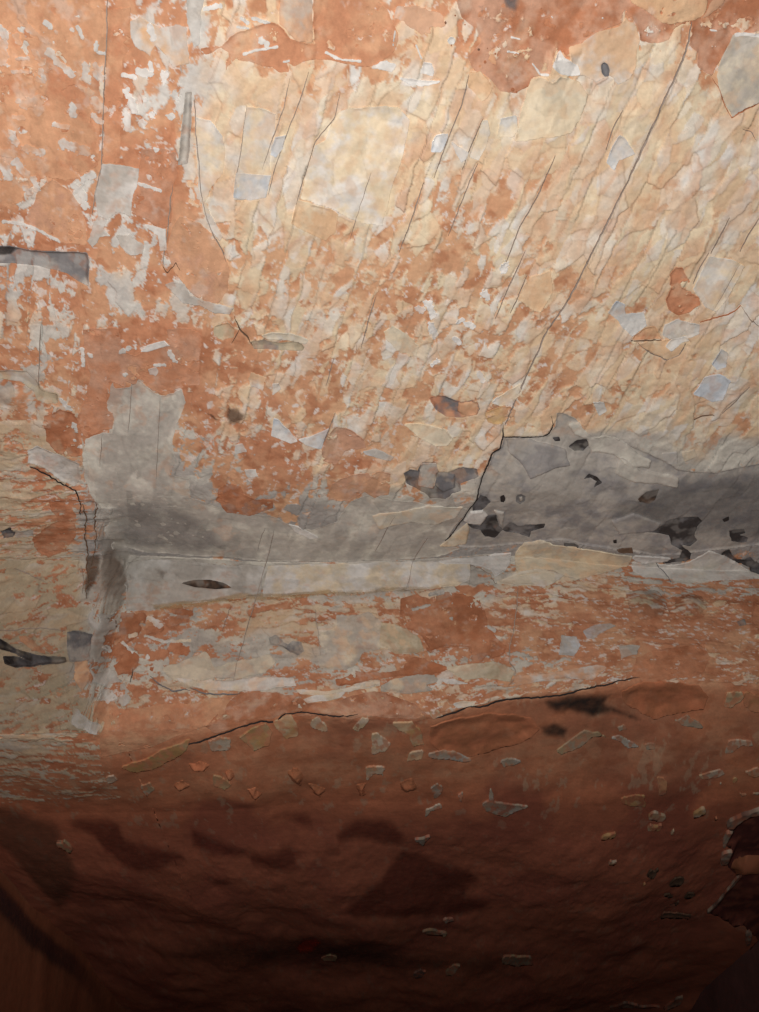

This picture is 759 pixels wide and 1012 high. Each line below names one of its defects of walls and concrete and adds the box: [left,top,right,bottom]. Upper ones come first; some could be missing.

crack [194,99,226,261]
crack [237,72,309,194]
crack [296,95,340,204]
peeling [0,0,759,360]
crack [399,22,692,586]
crack [693,218,759,326]
crack [694,386,750,420]
crack [30,467,98,599]
spalling [0,325,759,780]
crack [188,711,357,745]
peeling [482,788,528,817]
peeling [693,806,759,950]